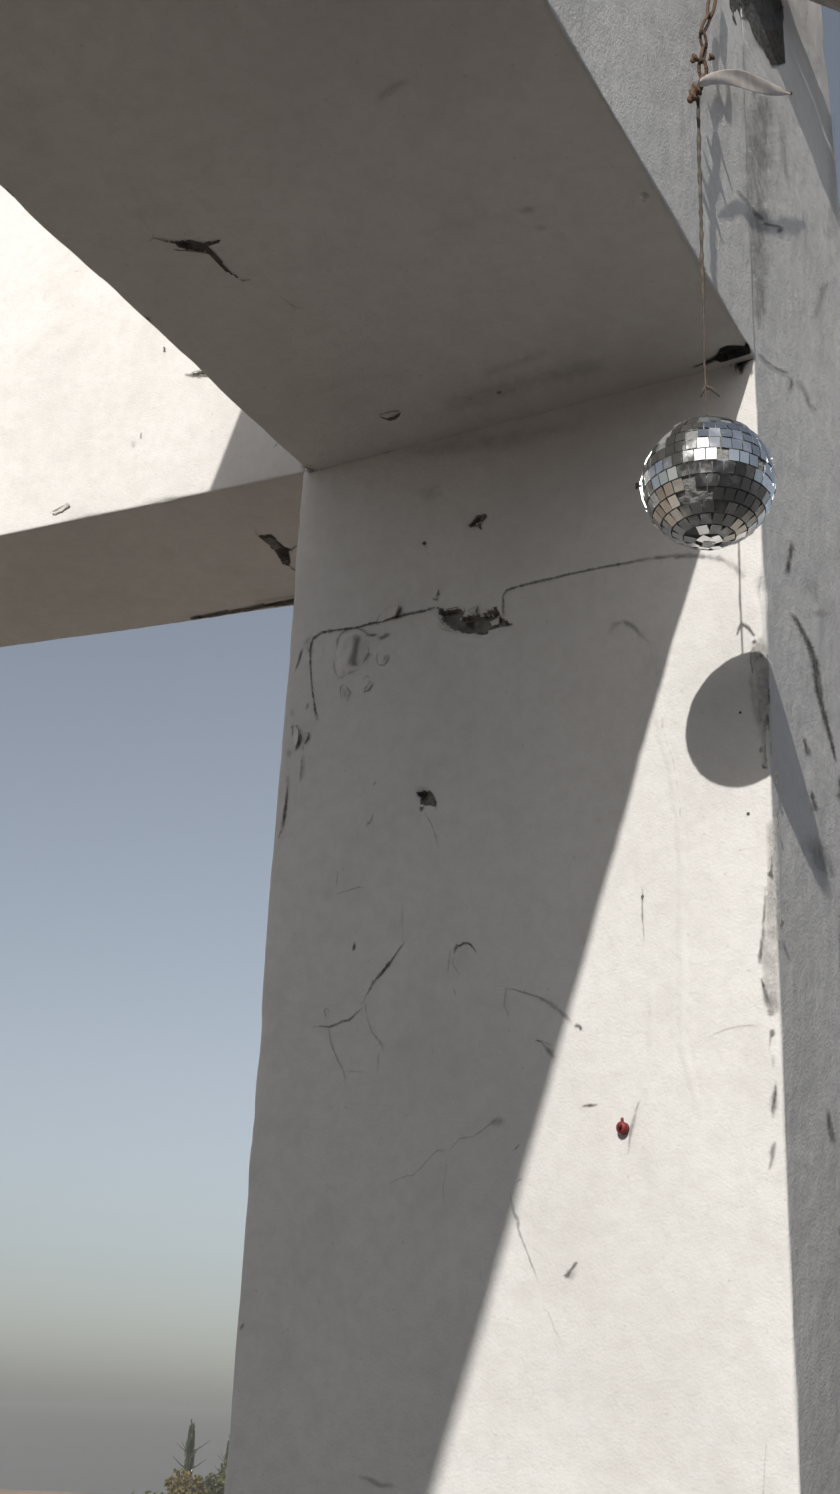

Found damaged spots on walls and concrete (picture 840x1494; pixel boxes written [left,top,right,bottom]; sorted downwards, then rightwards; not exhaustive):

crack [155,238,247,281]
spalling [258,535,296,570]
crack [502,563,622,610]
spalling [434,590,513,635]
crack [298,609,430,714]
spalling [417,791,436,810]